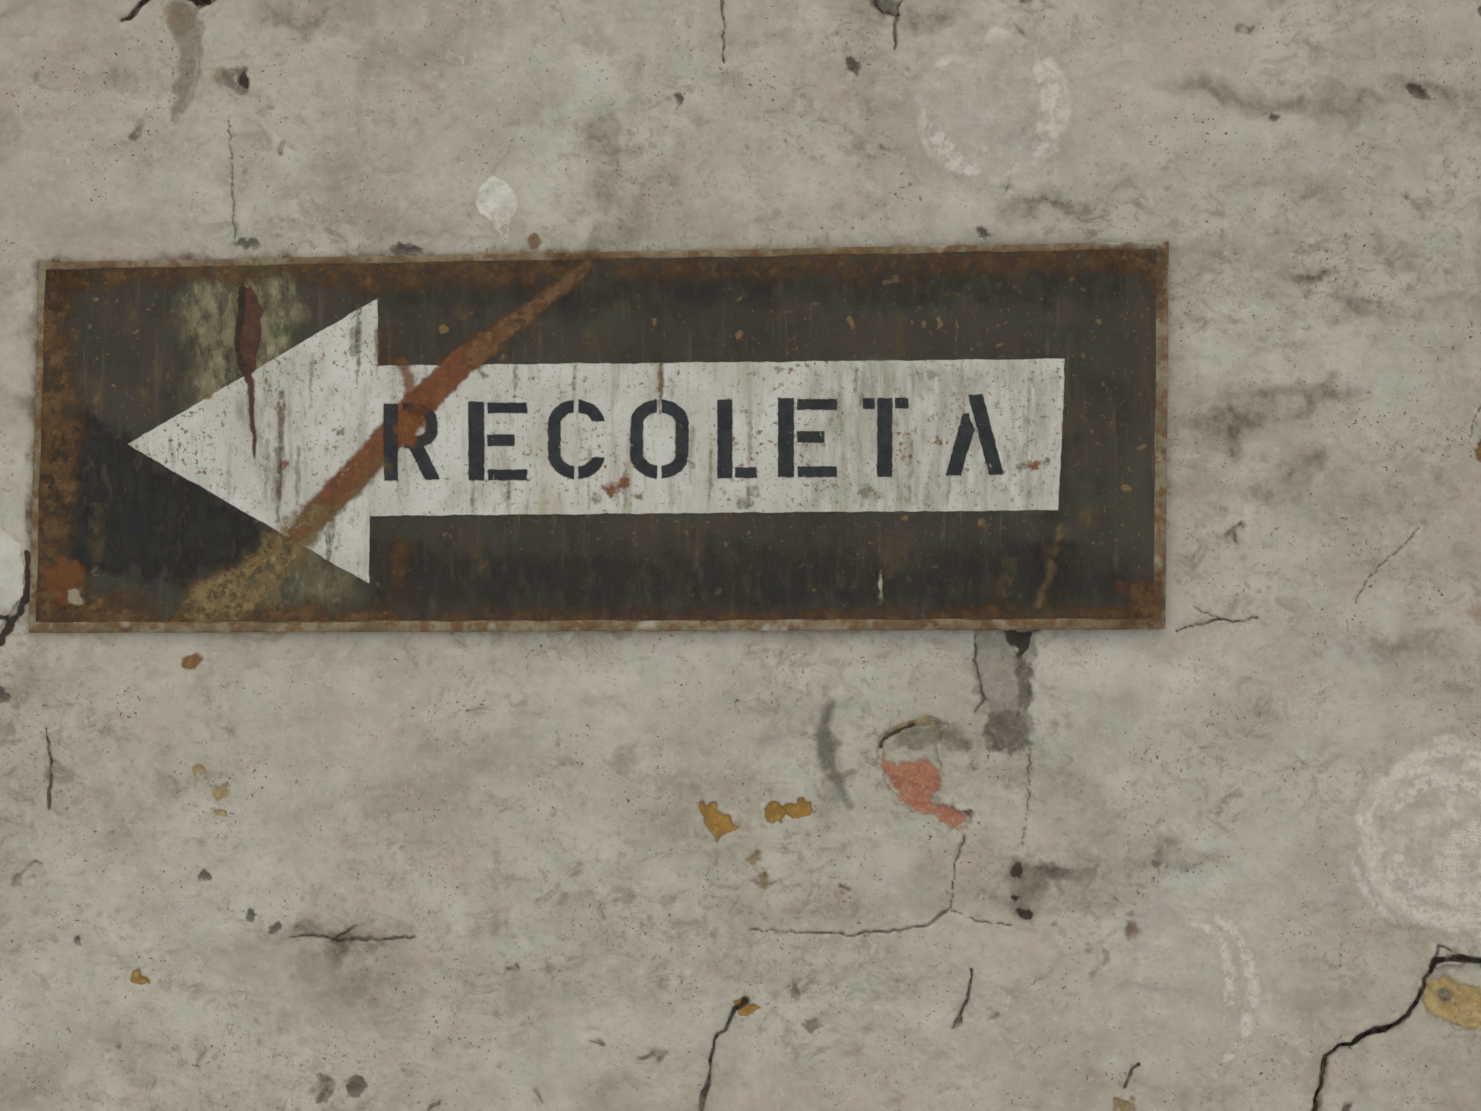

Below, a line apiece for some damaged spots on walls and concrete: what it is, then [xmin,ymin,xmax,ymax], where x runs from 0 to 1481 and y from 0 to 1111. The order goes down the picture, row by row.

crack [123,0,150,21]
crack [189,0,211,8]
crack [0,550,31,646]
flaking render [973,630,1032,752]
peeling [783,797,812,818]
flaking render [876,716,971,829]
damp [1351,734,1481,943]
crack [700,997,748,1097]
crack [1312,954,1481,1110]
flaking render [1421,961,1481,1030]